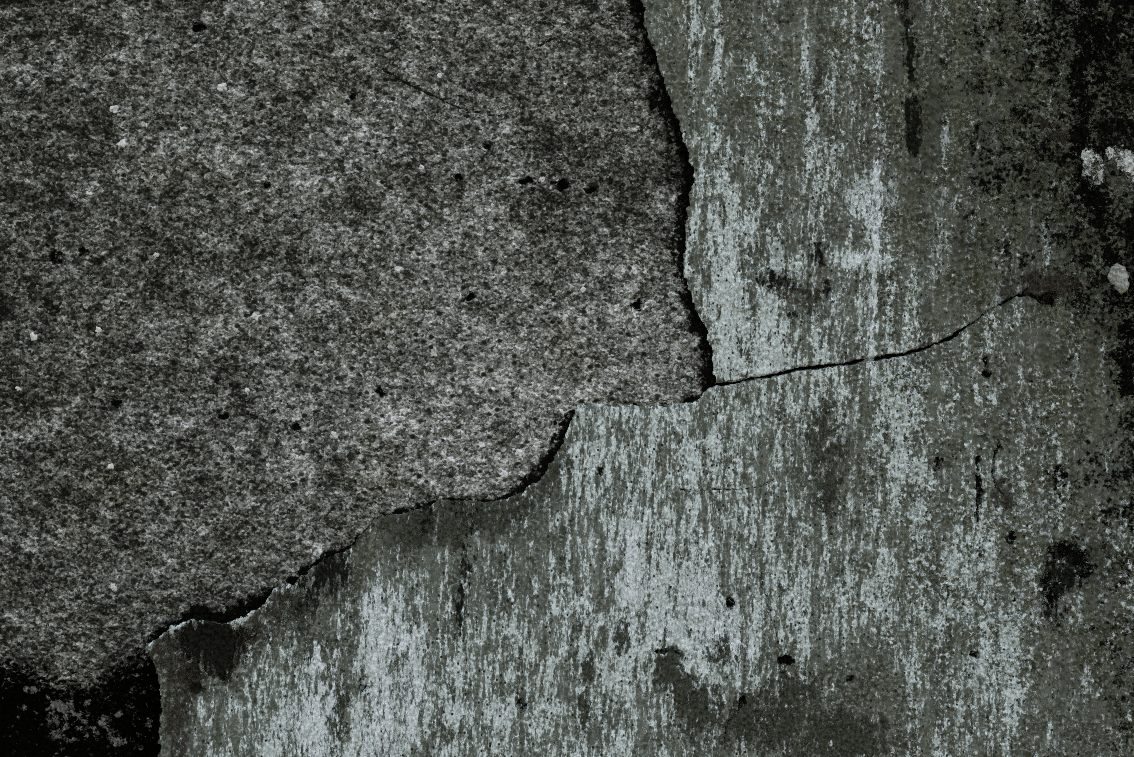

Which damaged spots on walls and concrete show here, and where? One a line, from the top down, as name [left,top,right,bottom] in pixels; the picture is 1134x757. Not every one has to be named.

spalling [0,0,715,757]
crack [710,293,1046,387]
spalling [1037,293,1057,307]
spalling [975,442,1000,522]
spalling [1047,465,1068,491]
spalling [1040,540,1097,609]
peeling [652,630,901,757]